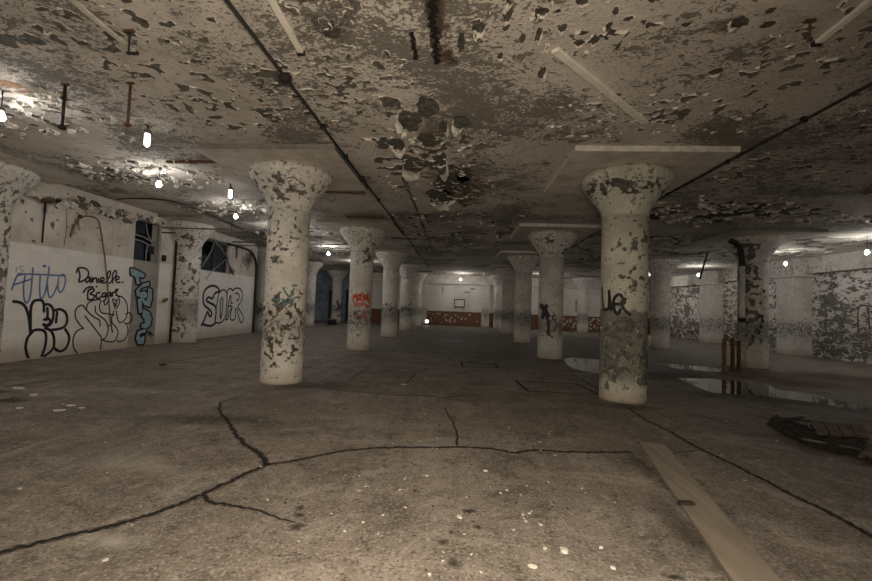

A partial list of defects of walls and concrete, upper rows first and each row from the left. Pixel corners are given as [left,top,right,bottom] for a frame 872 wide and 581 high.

peeling [0,0,501,211]
peeling [443,0,666,58]
peeling [546,8,872,139]
peeling [0,72,377,274]
peeling [0,182,167,354]
peeling [172,233,204,339]
peeling [257,290,307,372]
peeling [588,315,648,395]
peeling [585,177,872,357]
crack [0,357,633,556]
crack [628,409,872,539]